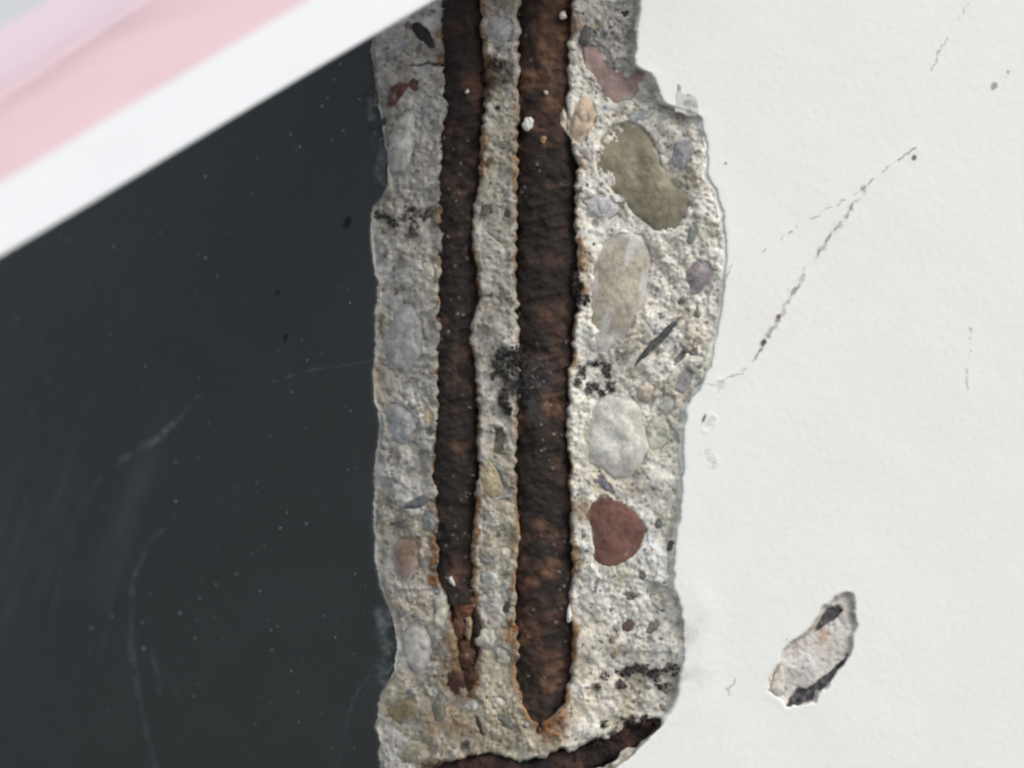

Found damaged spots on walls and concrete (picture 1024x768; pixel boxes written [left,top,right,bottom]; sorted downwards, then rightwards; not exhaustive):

crack [754,148,915,360]
rust [490,337,552,437]
spalling [368,0,727,768]
rust [428,505,441,587]
rust [447,562,488,699]
rust [505,617,571,741]
rust [590,713,661,748]
spalling [768,592,858,707]